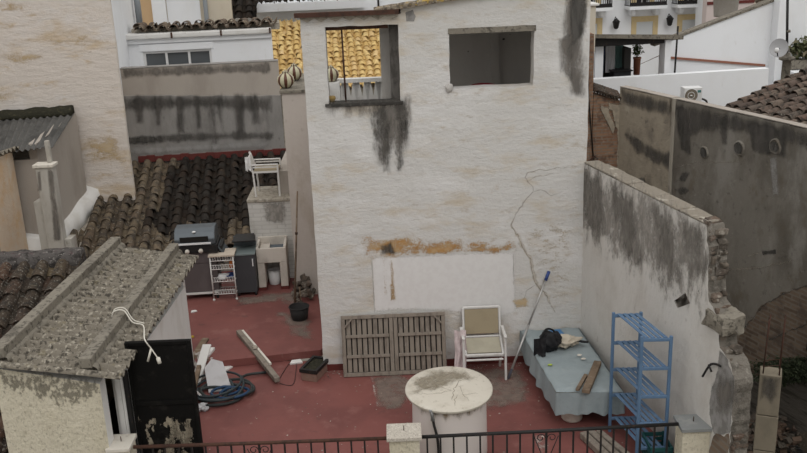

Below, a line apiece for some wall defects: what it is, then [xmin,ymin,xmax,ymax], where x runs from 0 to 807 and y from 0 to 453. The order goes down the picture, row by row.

damp [561,0,586,75]
damp [85,95,272,166]
damp [336,100,410,170]
damp [622,92,807,196]
damp [583,172,602,238]
damp [612,183,642,269]
damp [652,209,678,283]
flaking render [737,285,807,377]
flaking render [709,352,738,453]